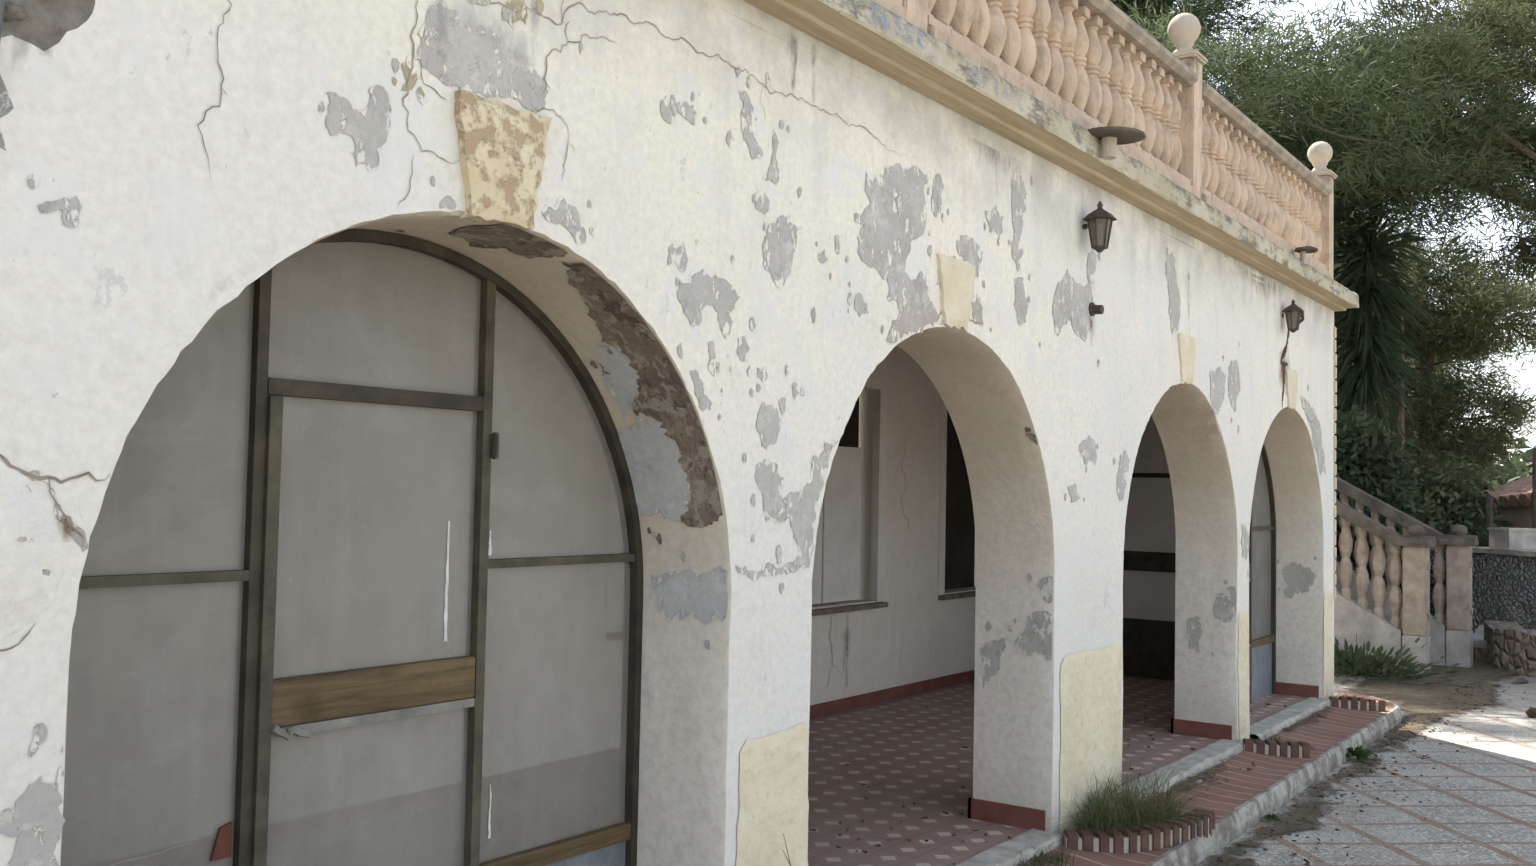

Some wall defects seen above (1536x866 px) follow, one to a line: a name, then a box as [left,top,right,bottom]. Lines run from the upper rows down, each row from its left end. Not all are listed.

spalling [0,75,14,151]
spalling [1,0,95,51]
crack [197,0,232,177]
crack [397,0,459,207]
peeling [318,0,550,172]
crack [489,0,907,182]
peeling [727,66,949,344]
crack [0,454,109,551]
flaking render [449,195,839,650]
crack [0,623,36,652]
peeling [981,574,1053,690]
peeling [0,722,65,866]